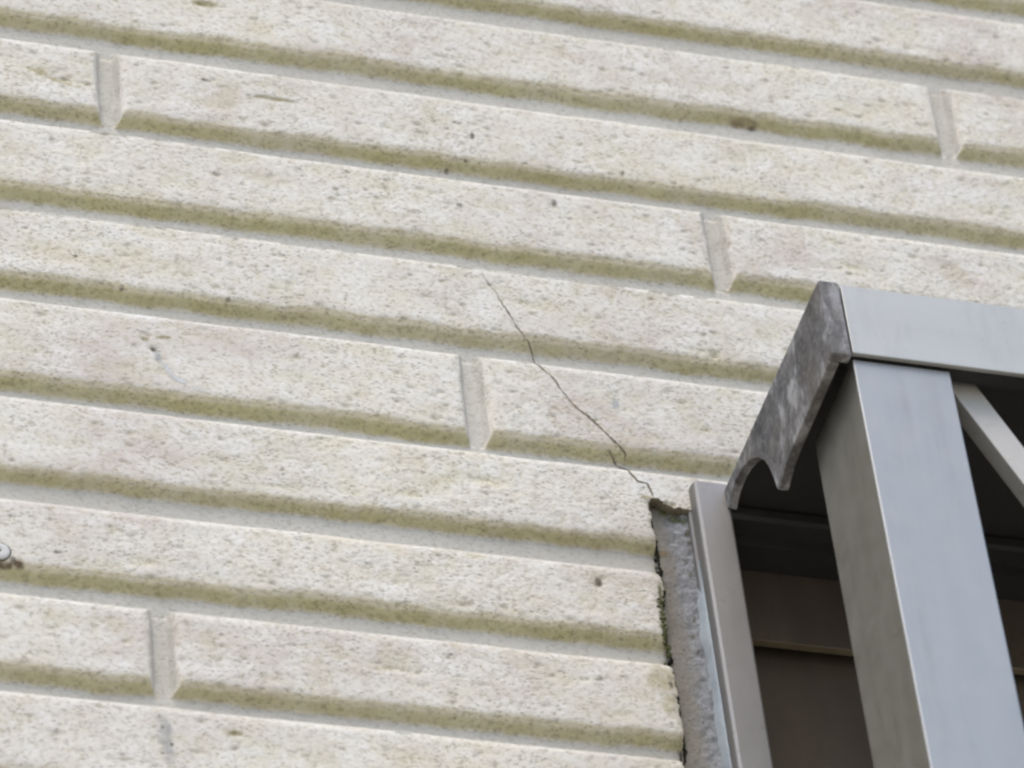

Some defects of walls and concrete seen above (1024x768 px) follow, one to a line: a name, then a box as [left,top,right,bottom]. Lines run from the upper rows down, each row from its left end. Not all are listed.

crack [482,274,653,495]